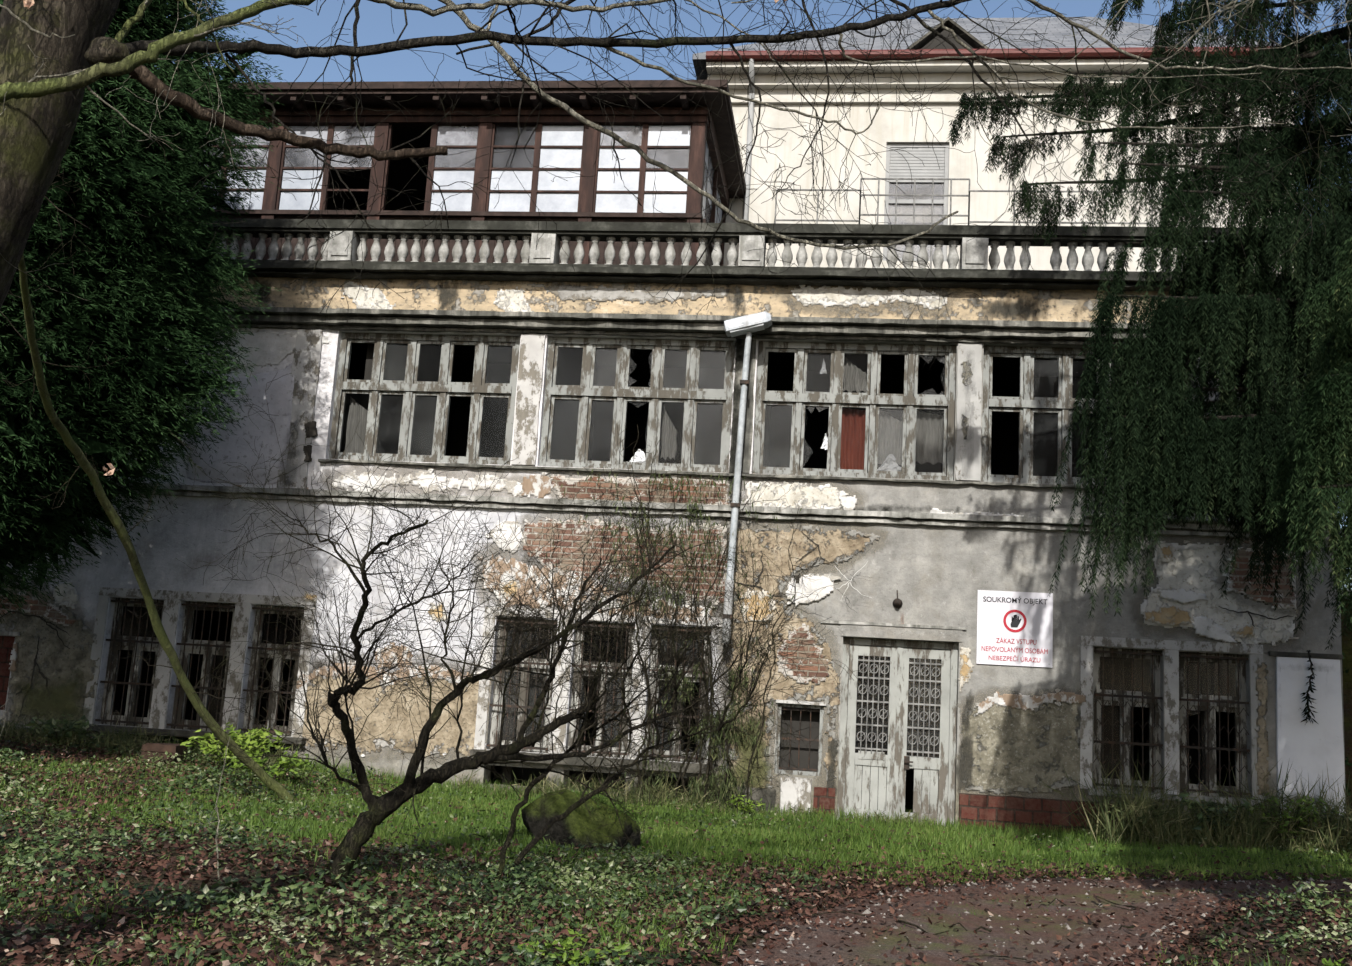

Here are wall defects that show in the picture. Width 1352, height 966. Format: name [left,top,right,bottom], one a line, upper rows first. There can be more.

peeling [493,287,534,312]
peeling [791,285,947,310]
peeling [961,360,973,386]
peeling [961,414,969,440]
flaking render [331,467,880,789]
flaking render [1140,540,1299,646]
flaking render [961,688,1086,795]
flaking render [1255,662,1271,795]